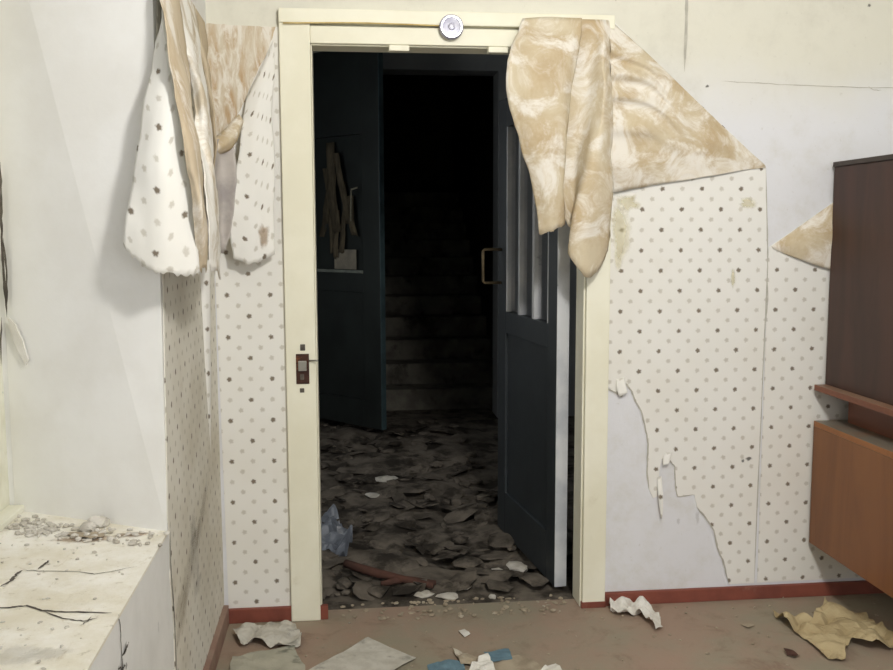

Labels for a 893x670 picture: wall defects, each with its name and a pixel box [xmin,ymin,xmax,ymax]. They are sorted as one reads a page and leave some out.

crack [0,560,129,670]